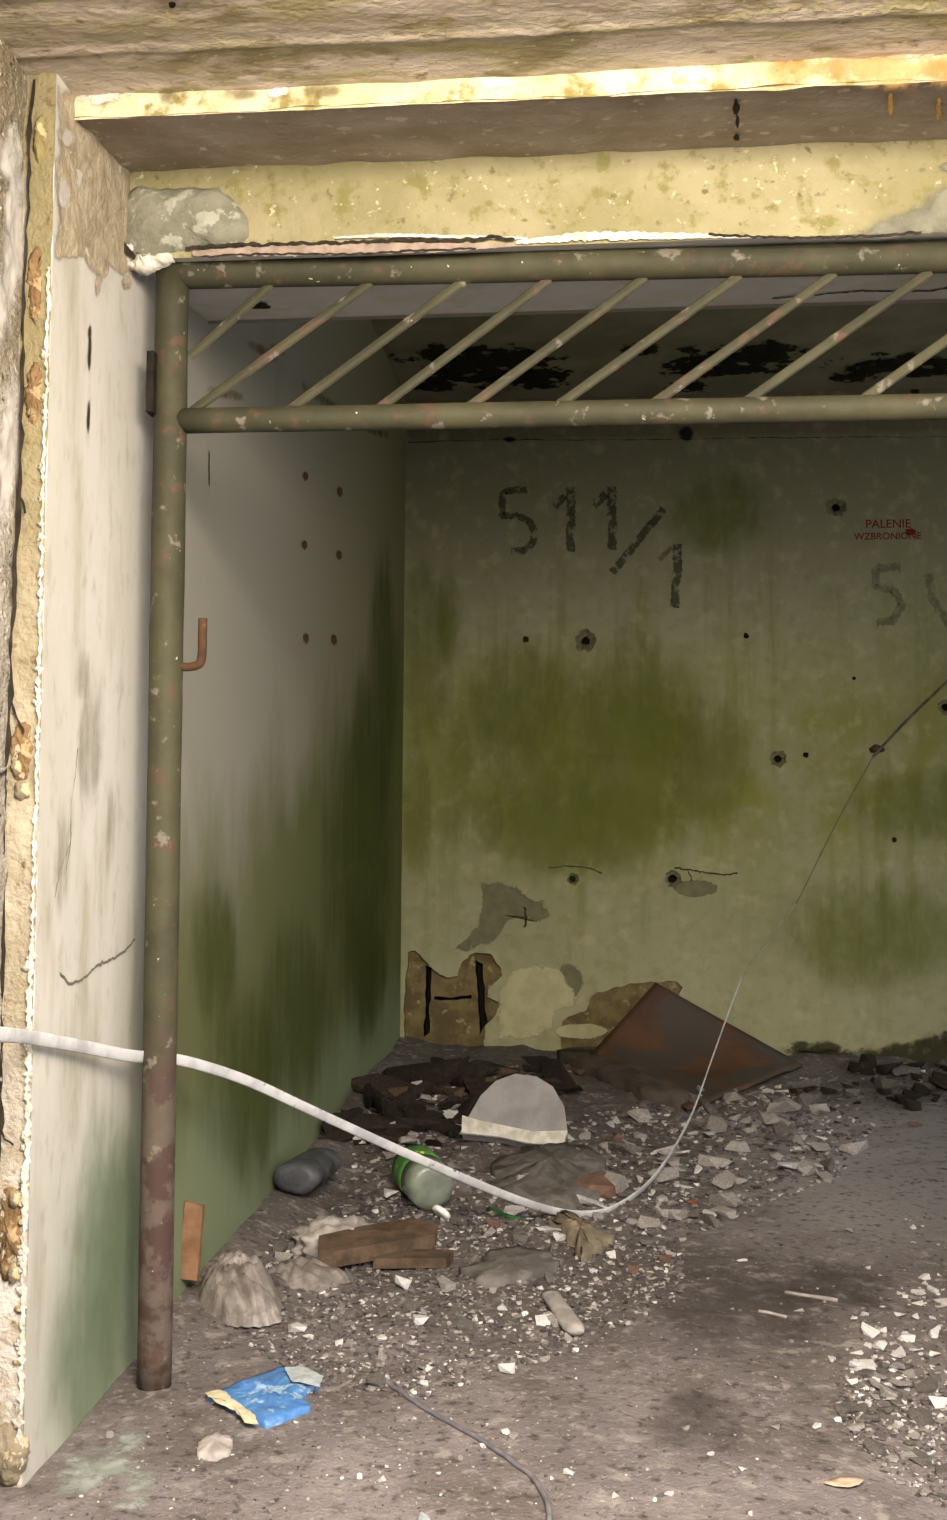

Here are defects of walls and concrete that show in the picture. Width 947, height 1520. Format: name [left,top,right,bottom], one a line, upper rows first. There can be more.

rust [772,54,947,115]
crack [0,79,36,1158]
peeling [0,88,132,1487]
flaking render [403,883,683,1049]
peeling [665,870,717,897]